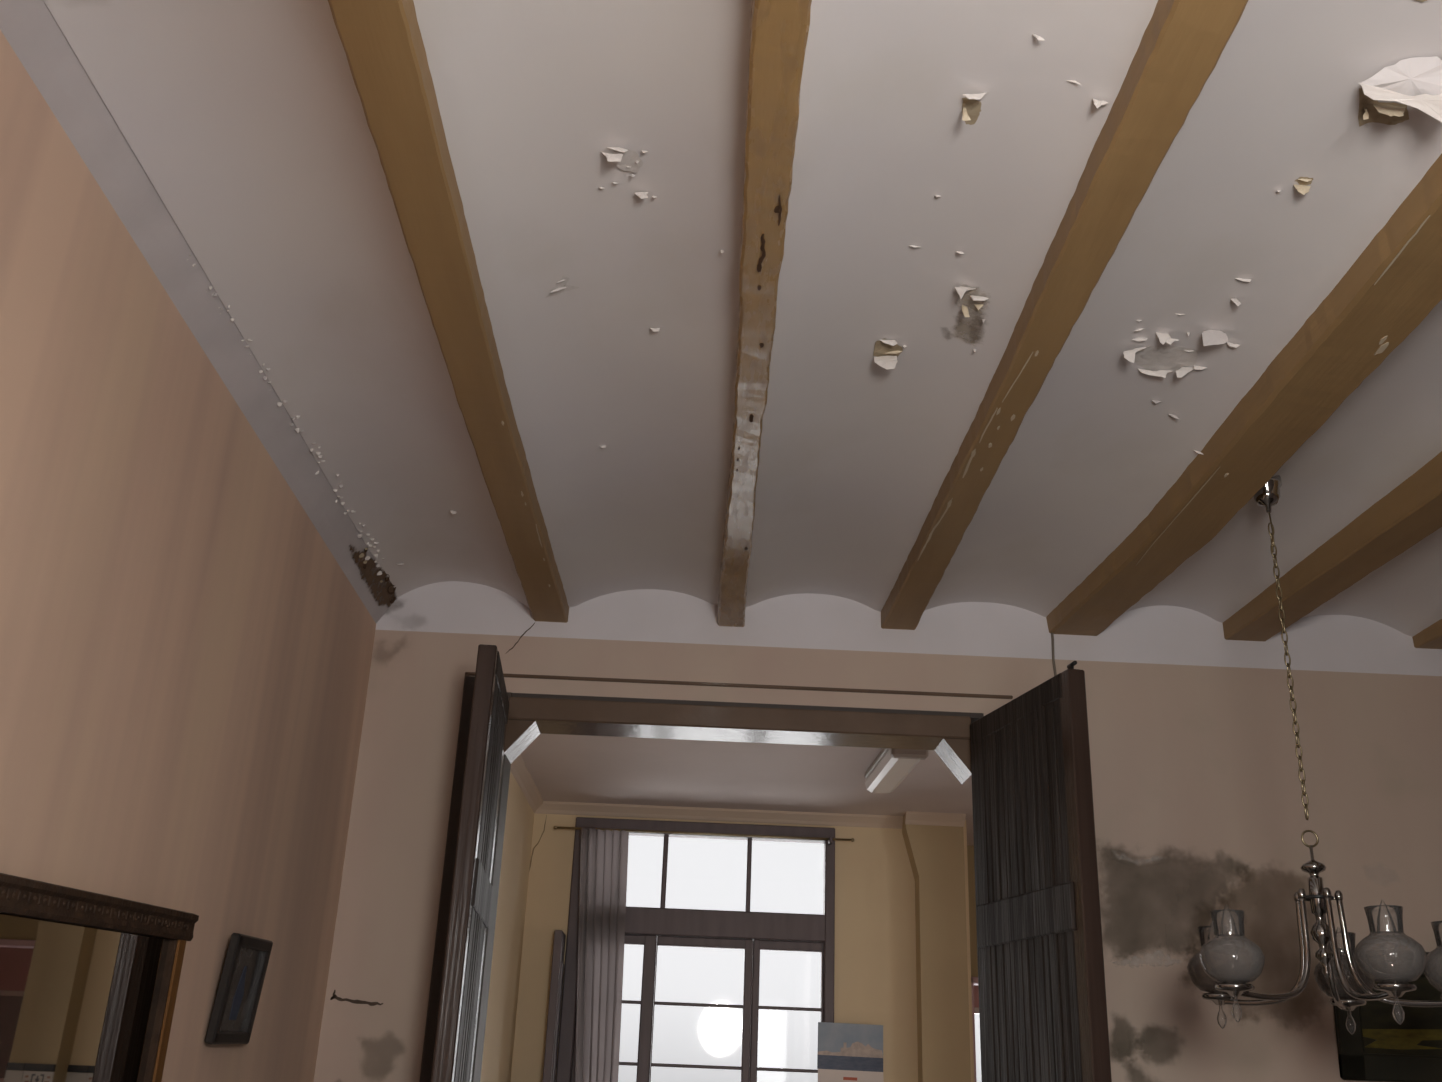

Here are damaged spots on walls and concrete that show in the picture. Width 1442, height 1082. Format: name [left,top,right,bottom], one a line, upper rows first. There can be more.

peeling [962,93,987,125]
peeling [1358,56,1442,127]
peeling [599,146,657,199]
peeling [1277,177,1313,195]
peeling [955,286,989,352]
peeling [873,338,907,370]
peeling [1123,320,1240,378]
leakage [349,542,397,607]